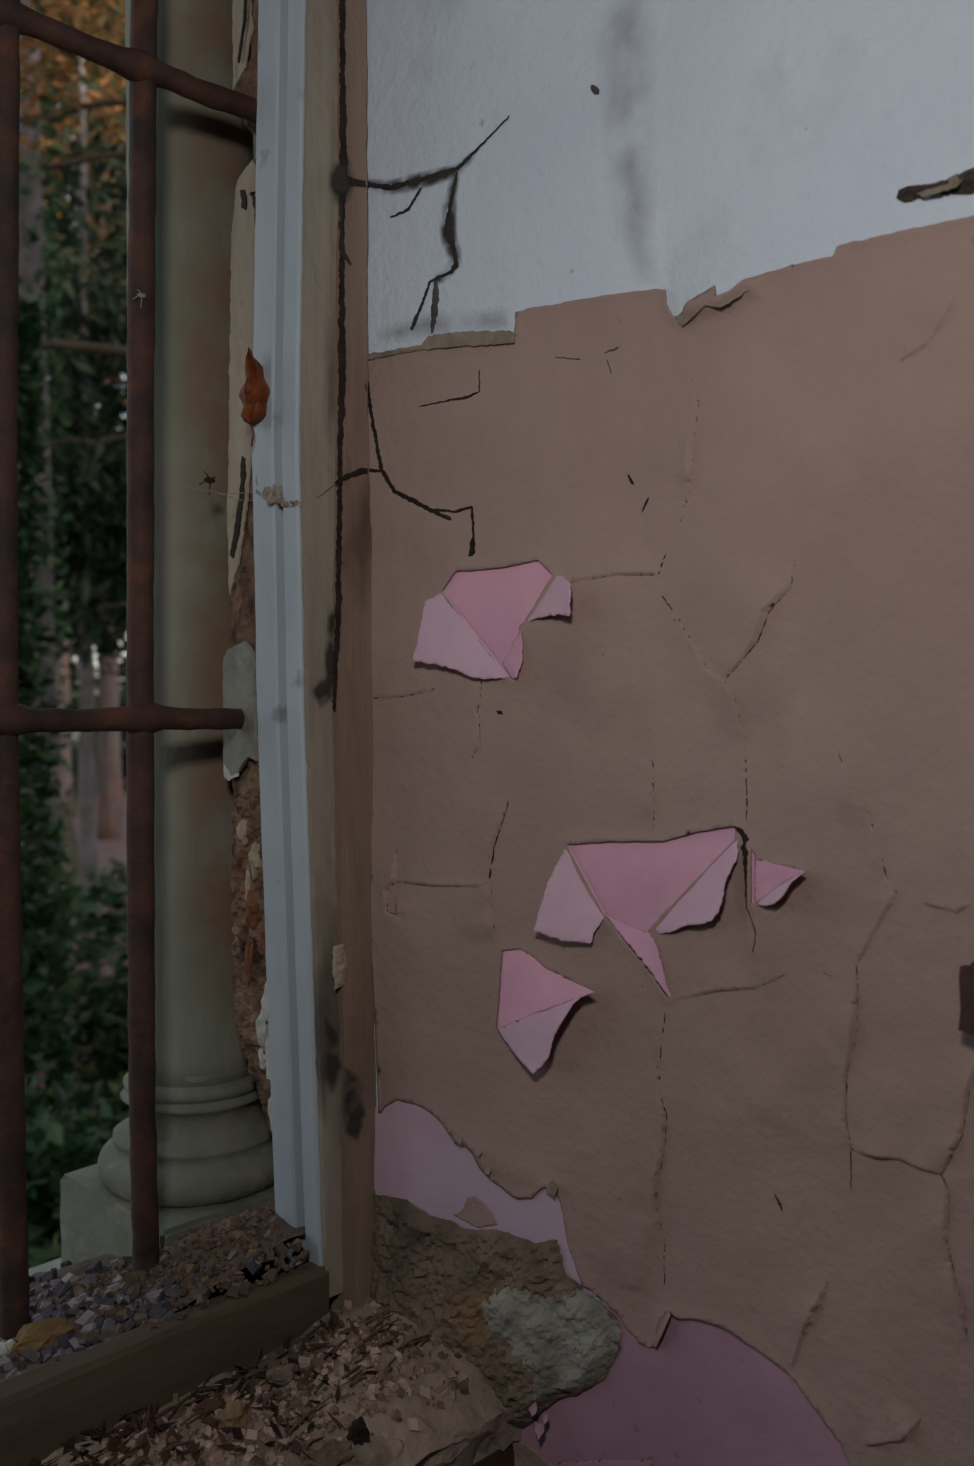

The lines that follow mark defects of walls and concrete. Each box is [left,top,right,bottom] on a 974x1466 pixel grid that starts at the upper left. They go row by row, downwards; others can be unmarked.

crack [338,116,509,330]
flaking render [896,167,974,203]
crack [419,370,480,407]
crack [334,381,476,557]
crack [651,554,795,702]
peeling [223,764,239,781]
crack [742,738,750,819]
crack [386,801,509,928]
crack [823,959,865,1190]